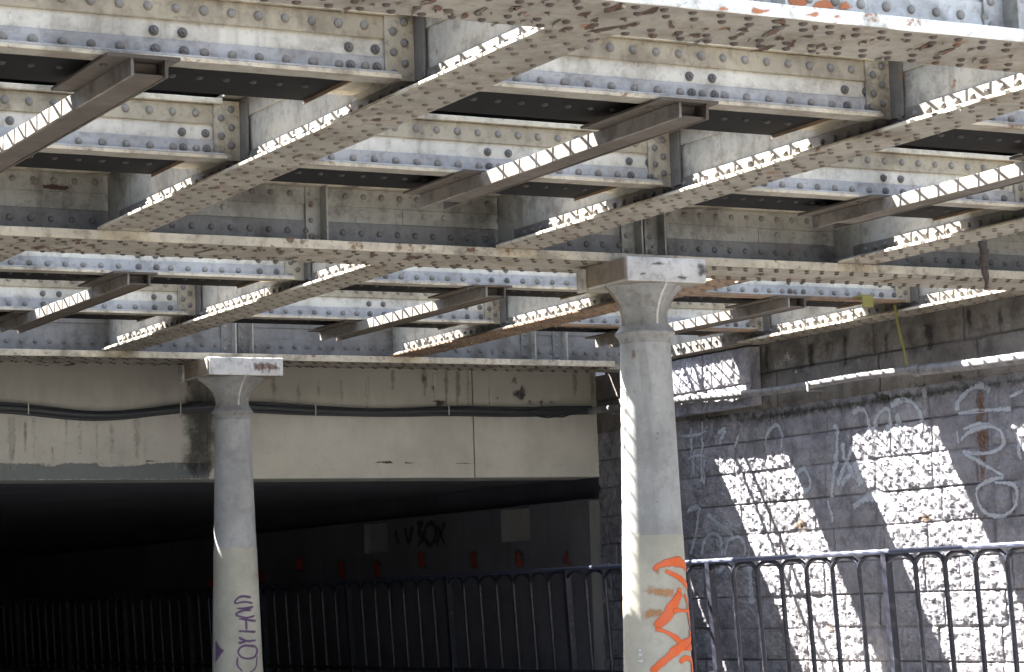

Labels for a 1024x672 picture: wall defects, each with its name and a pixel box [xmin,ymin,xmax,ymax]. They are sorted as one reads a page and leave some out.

corrosion [788,0,851,18]
water stain [184,382,215,471]
corrosion [976,396,986,481]